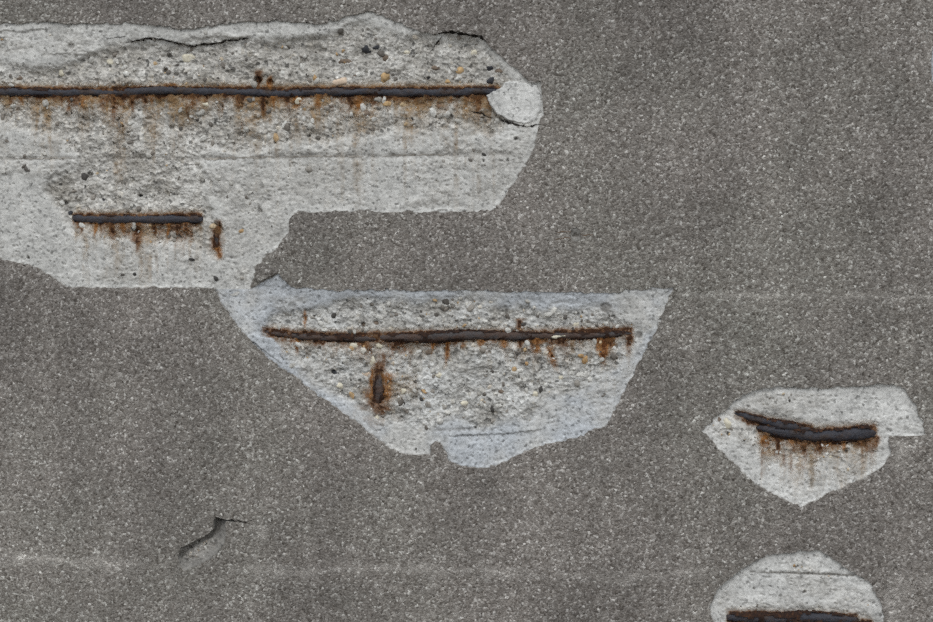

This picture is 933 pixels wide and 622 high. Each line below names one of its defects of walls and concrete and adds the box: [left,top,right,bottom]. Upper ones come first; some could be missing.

rust [0,70,500,132]
rust [73,212,202,250]
rust [211,221,222,258]
spalling [0,11,674,468]
rust [263,312,441,414]
rust [479,318,633,362]
rust [739,411,880,464]
spalling [702,383,926,507]
spalling [177,517,234,571]
spalling [709,550,884,622]